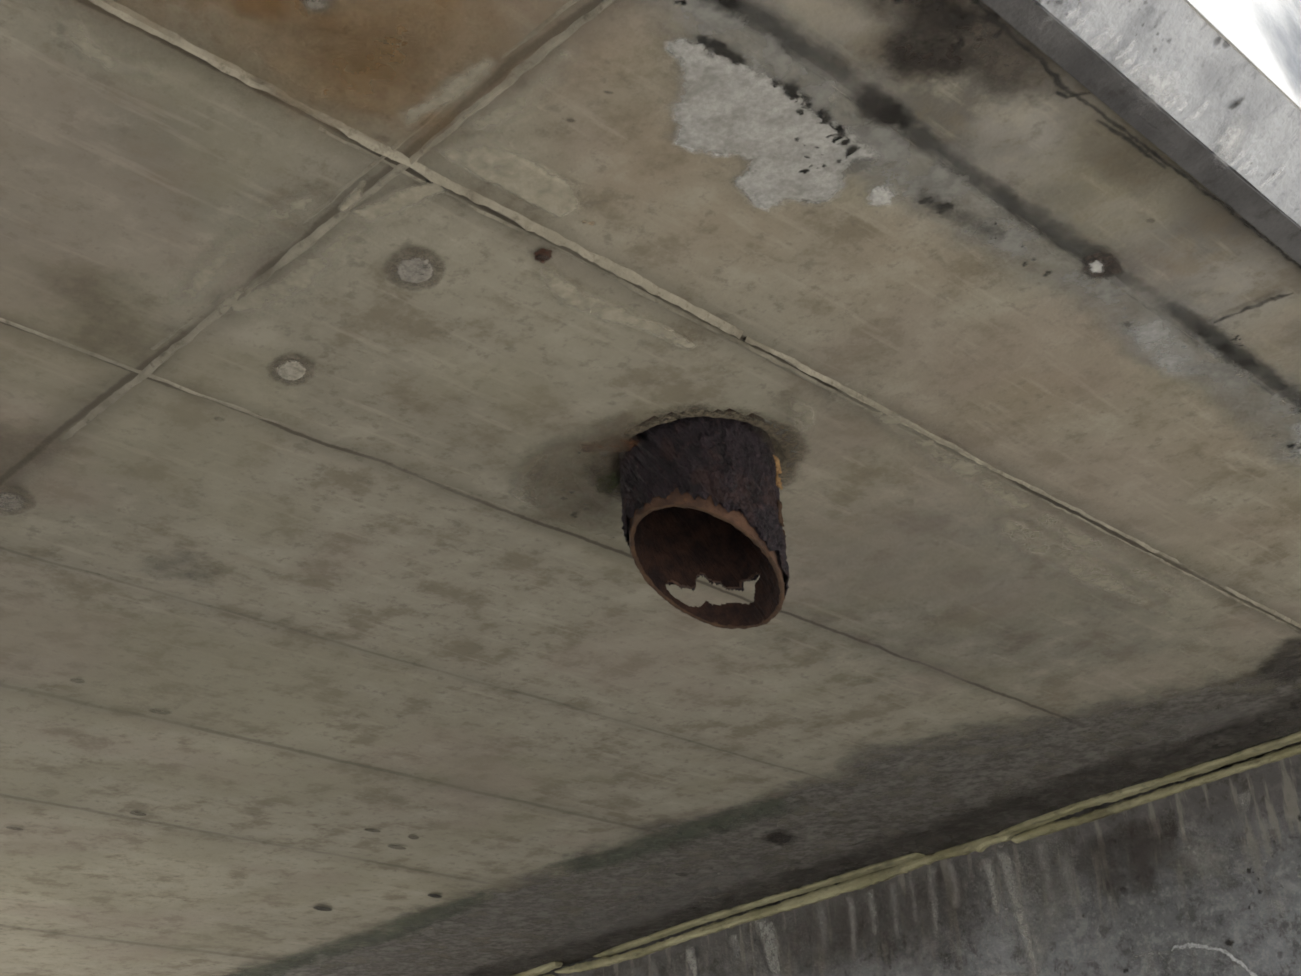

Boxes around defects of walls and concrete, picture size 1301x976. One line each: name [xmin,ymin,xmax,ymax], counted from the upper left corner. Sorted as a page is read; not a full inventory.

peeling [668,39,879,209]
leakage [668,0,1301,460]
corrosion [773,455,786,542]
leakage [235,640,1301,976]